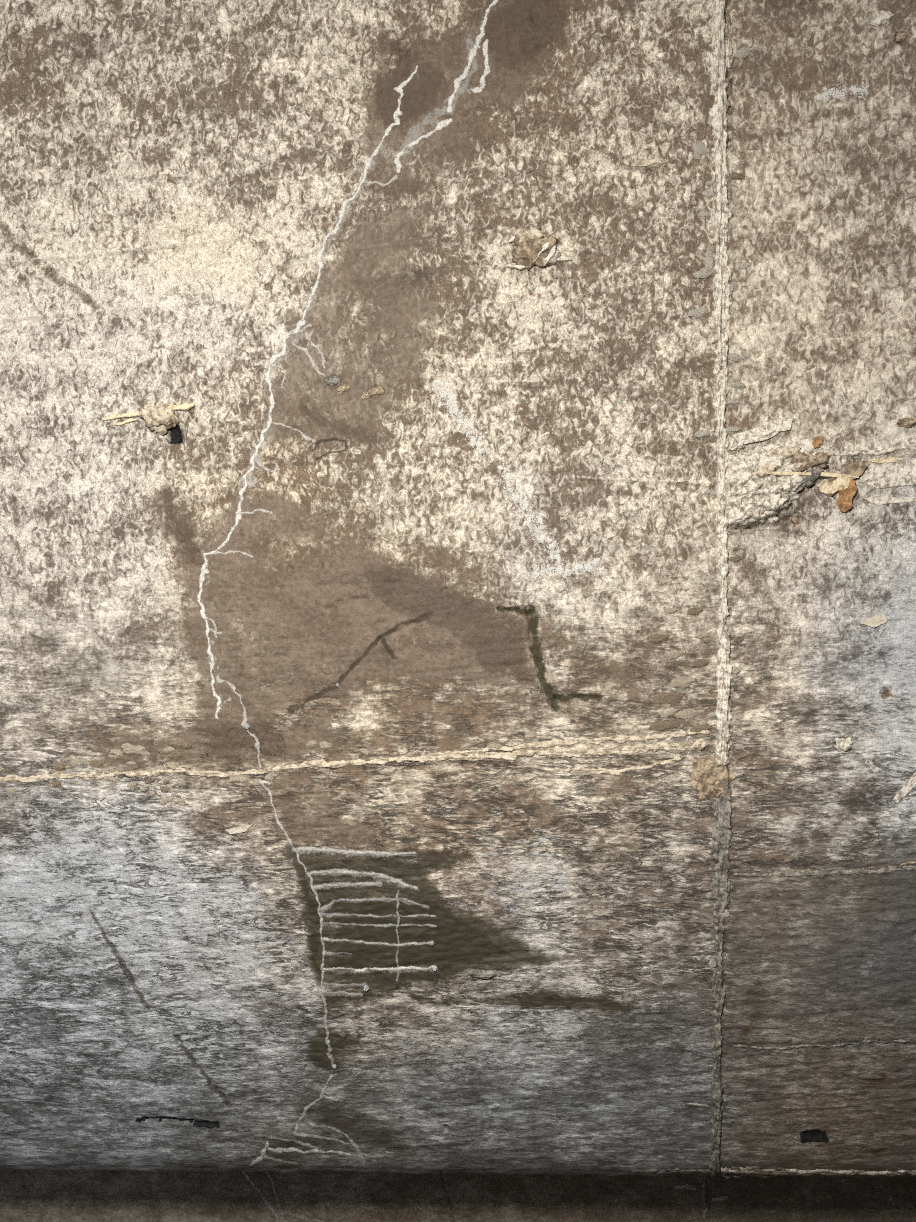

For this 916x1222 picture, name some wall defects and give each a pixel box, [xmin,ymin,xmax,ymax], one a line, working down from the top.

water stain [99,732,158,769]
water stain [156,490,537,767]
crack [197,0,498,1066]
water stain [431,378,606,578]
spalling [725,417,916,536]
water stain [268,773,631,1071]